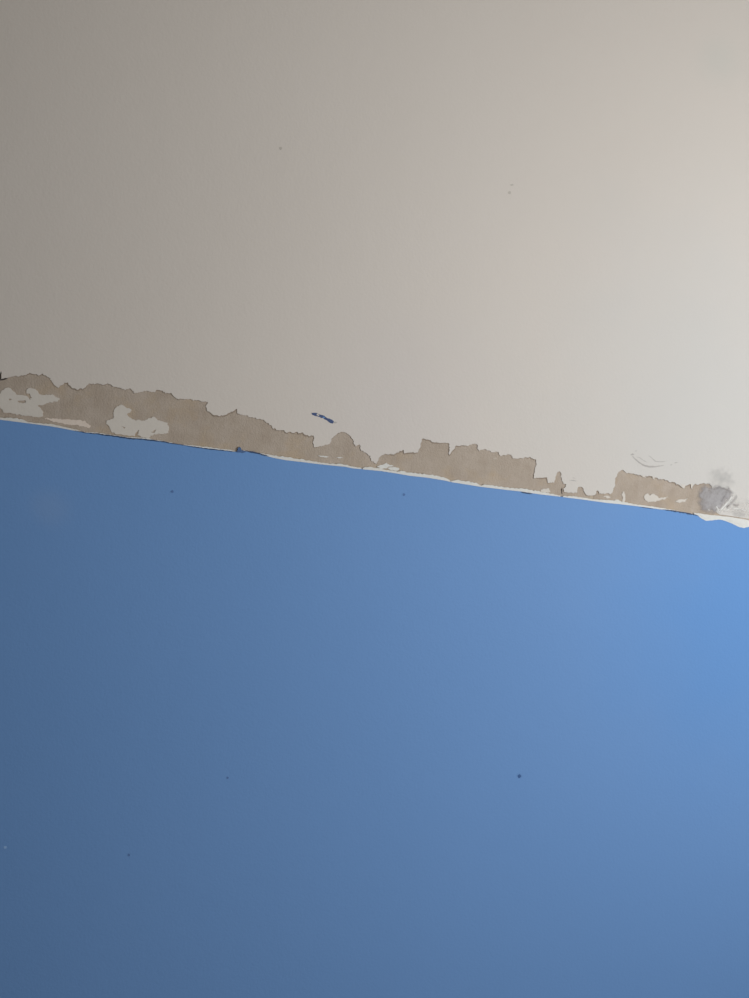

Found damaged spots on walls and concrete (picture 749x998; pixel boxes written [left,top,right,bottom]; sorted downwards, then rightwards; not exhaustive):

peeling [0,373,749,528]